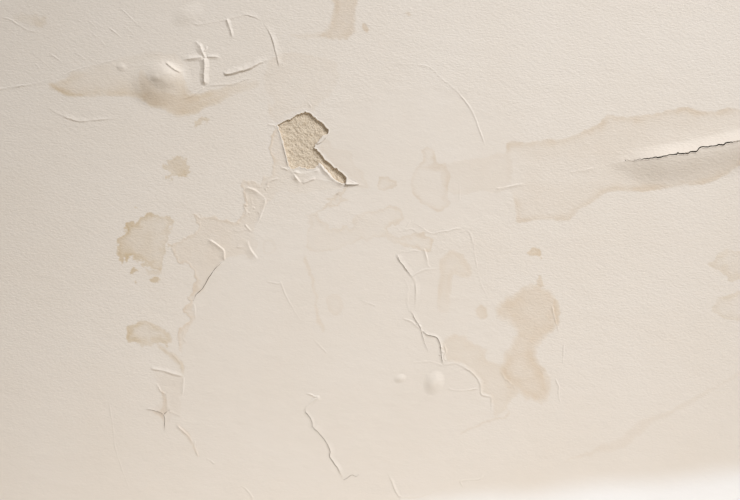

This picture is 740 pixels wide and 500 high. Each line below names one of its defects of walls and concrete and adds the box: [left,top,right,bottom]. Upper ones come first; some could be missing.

spalling [267,102,364,196]
water stain [410,106,740,224]
crack [625,140,738,162]
water stain [112,51,435,374]
crack [193,260,224,301]
crack [396,254,413,278]
crack [409,309,444,365]
water stain [438,275,562,435]
crack [144,408,168,431]
crack [304,406,360,481]